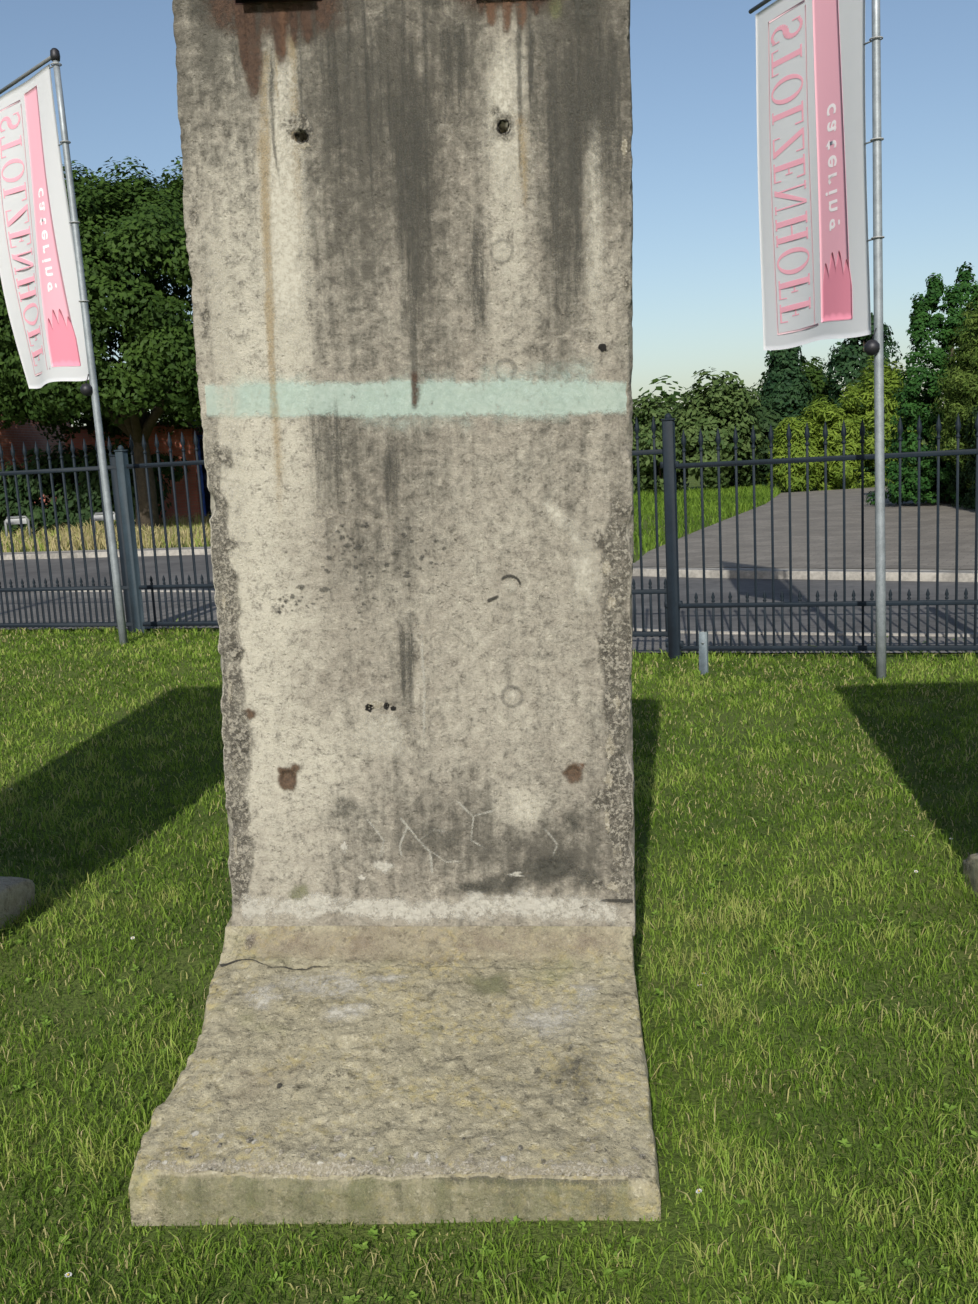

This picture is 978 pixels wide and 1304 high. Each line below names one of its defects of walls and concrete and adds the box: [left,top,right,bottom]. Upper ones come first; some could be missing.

corrosion [208,0,338,96]
corrosion [462,0,560,29]
damp [490,58,522,179]
damp [265,65,305,325]
damp [586,154,600,291]
damp [358,862,392,880]
damp [241,892,616,923]
crack [220,959,322,970]